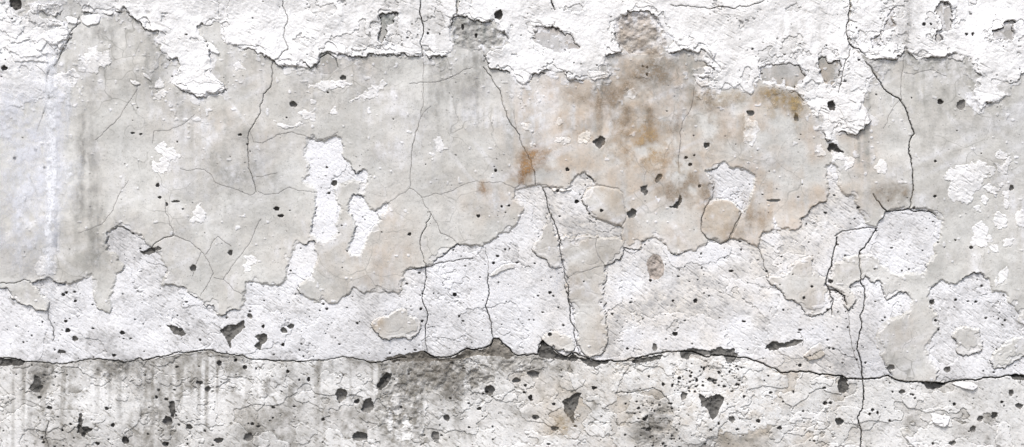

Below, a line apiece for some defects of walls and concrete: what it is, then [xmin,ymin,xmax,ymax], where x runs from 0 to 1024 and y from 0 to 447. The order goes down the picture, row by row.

crack [35,17,80,129]
crack [155,2,336,296]
flaking render [0,136,942,393]
peeling [0,0,1024,141]
rust [519,151,536,180]
crack [385,0,1024,447]
crack [5,349,406,364]
flaking render [921,267,1024,432]